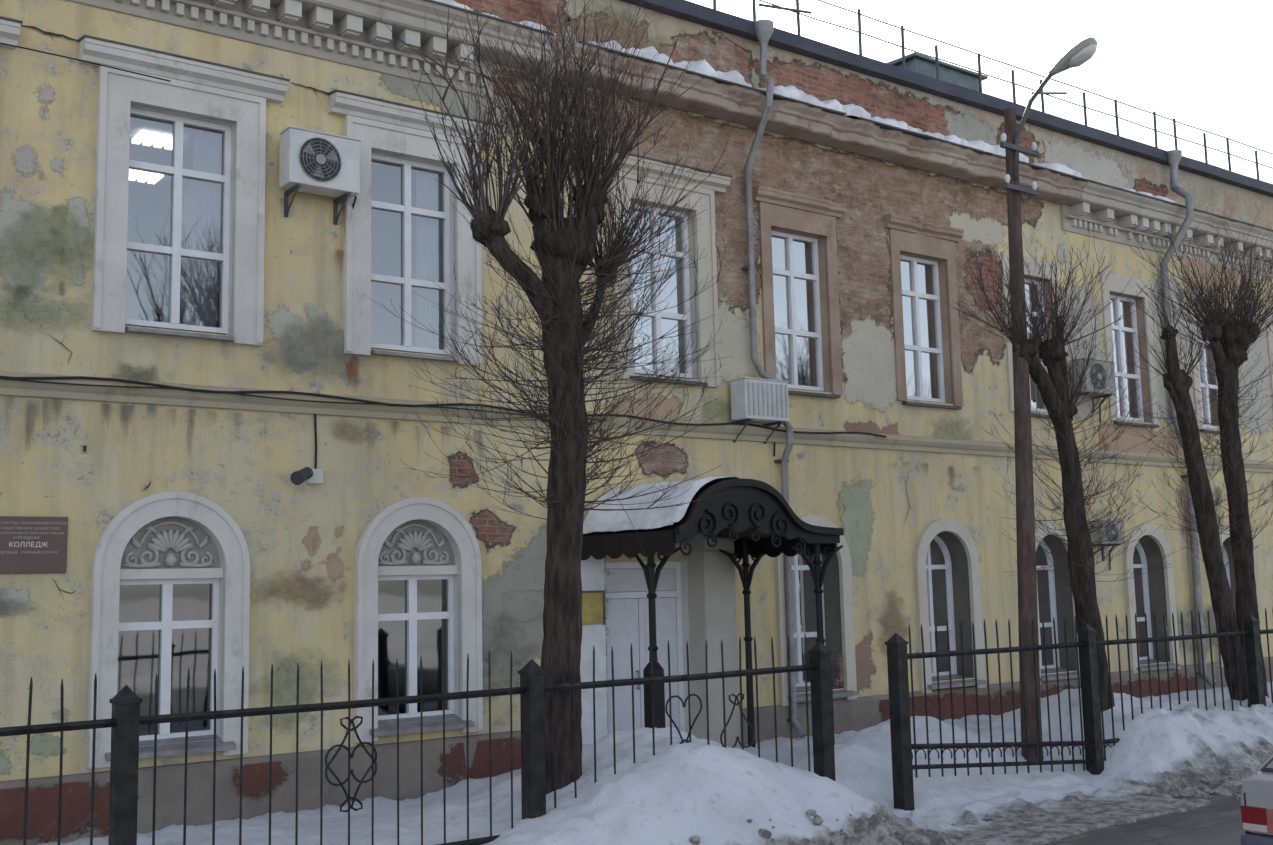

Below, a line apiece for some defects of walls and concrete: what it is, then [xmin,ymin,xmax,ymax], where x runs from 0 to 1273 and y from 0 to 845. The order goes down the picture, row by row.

flaking render [453,0,1168,198]
damp [7,214,92,293]
flaking render [379,69,1044,435]
damp [267,319,362,375]
flaking render [447,451,479,489]
flaking render [635,435,689,480]
peeling [298,525,350,583]
flaking render [470,508,519,553]
peeling [232,761,293,799]